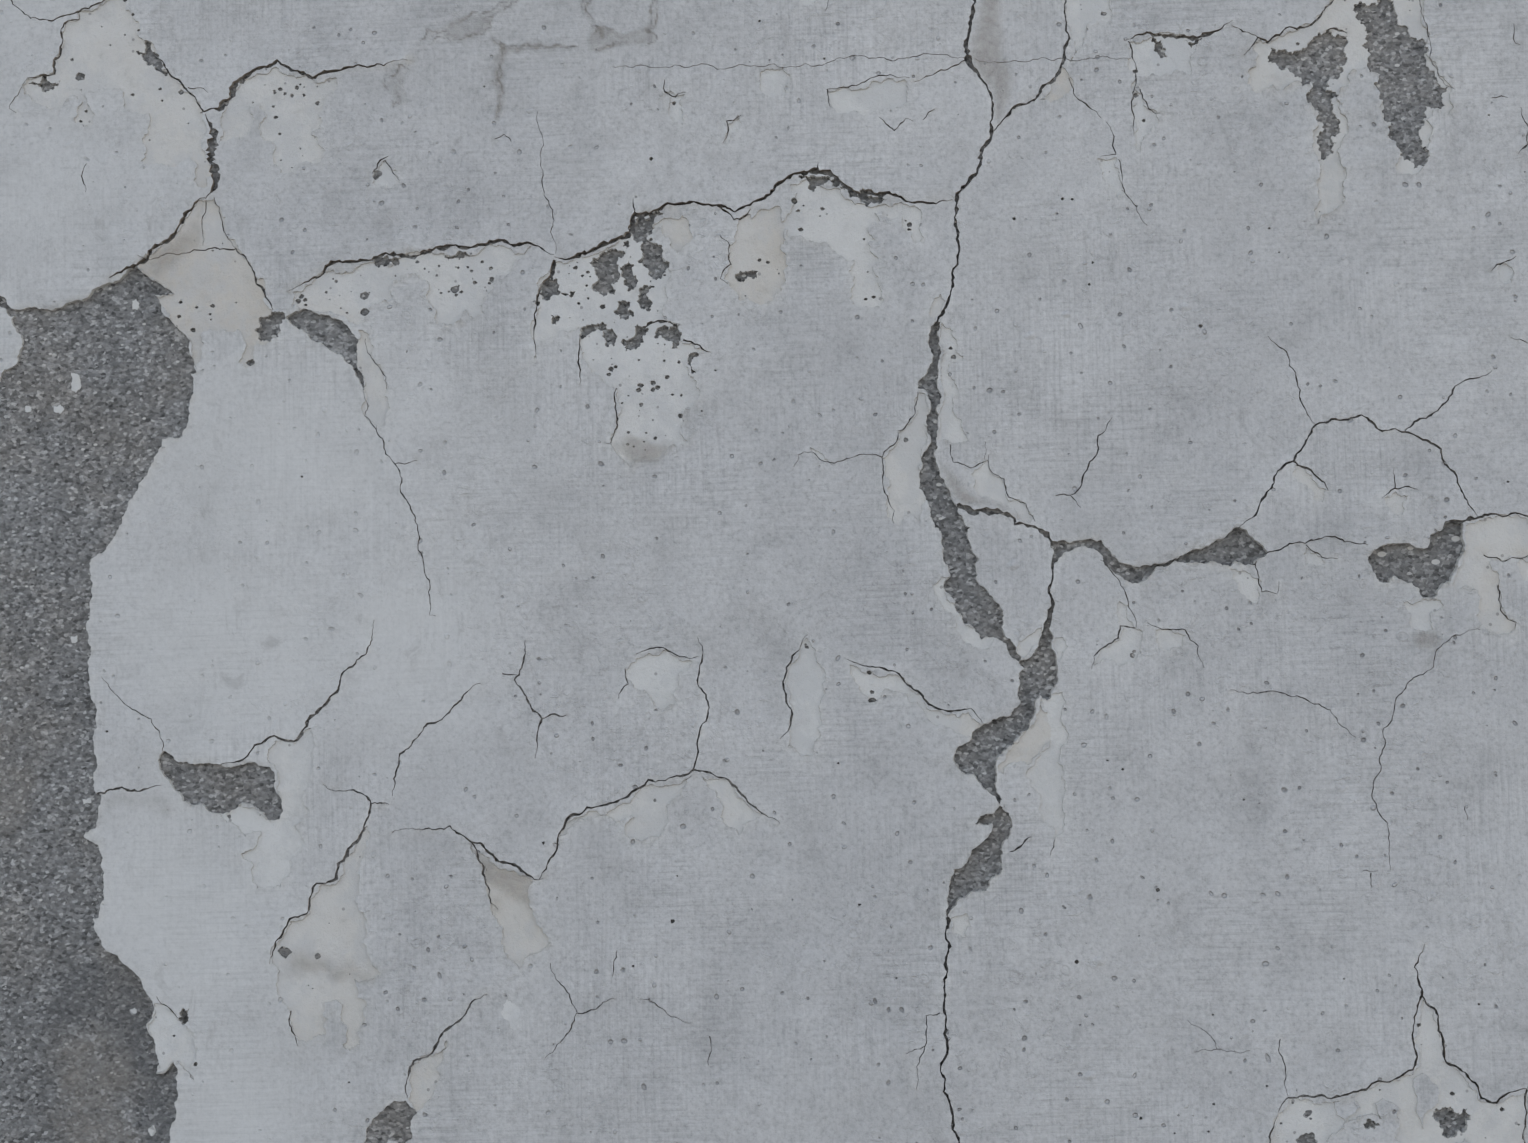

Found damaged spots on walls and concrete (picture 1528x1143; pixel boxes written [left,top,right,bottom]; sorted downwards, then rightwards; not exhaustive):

crack [133,43,362,305]
crack [315,0,1089,345]
peeling [1248,0,1453,223]
peeling [531,213,707,467]
peeling [0,0,531,1143]
spalling [850,295,1057,937]
crack [950,418,1112,636]
spalling [1054,528,1266,604]
crack [1237,347,1527,592]
peeling [1368,514,1528,634]
crack [274,646,780,950]
crack [916,917,960,1143]